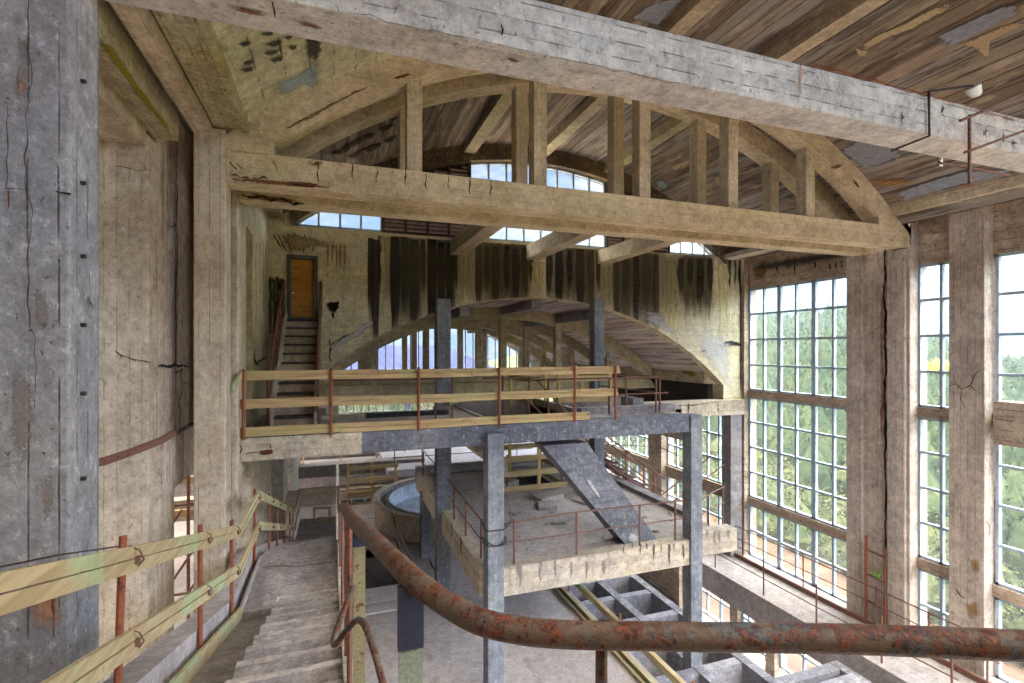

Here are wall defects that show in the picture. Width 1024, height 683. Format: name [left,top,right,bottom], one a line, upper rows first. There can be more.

peeling [855,3,949,57]
peeling [960,22,1023,57]
crack [5,0,37,409]
spalling [232,174,333,206]
crack [404,169,492,196]
crack [115,144,189,434]
damp [367,236,763,390]
crack [879,249,887,573]
crack [949,371,981,407]